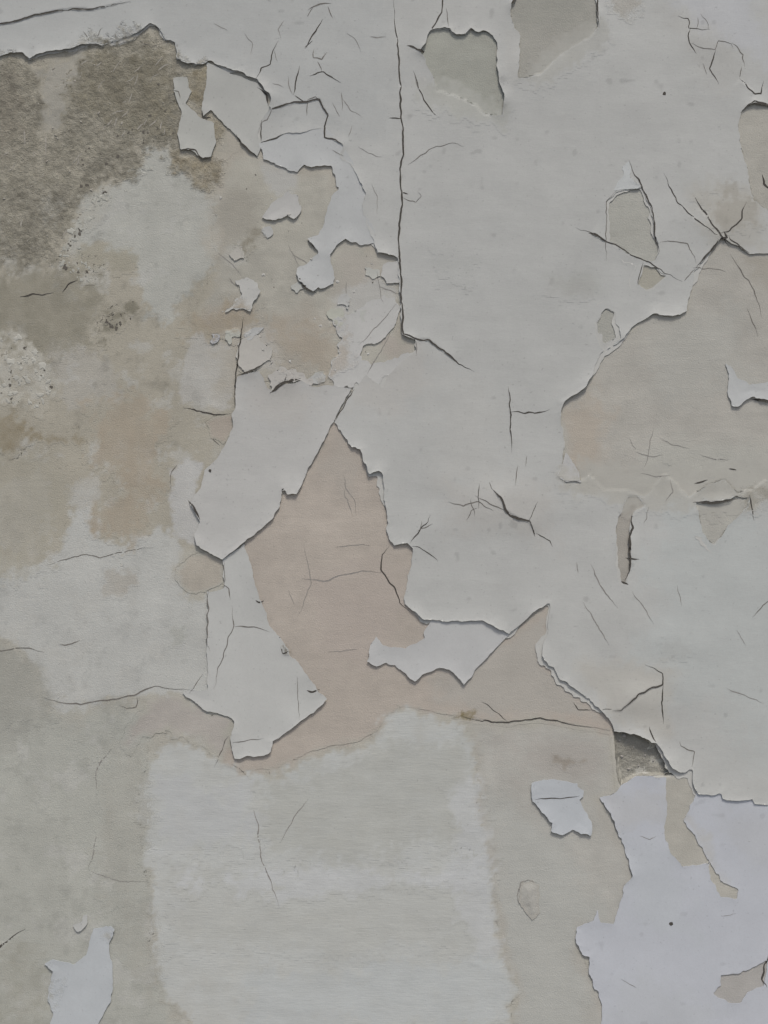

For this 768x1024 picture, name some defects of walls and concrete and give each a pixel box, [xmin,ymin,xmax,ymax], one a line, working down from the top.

water stain [28,41,93,137]
crack [217,0,471,417]
peeling [412,0,616,135]
crack [584,166,761,332]
peeling [738,103,768,210]
water stain [0,178,179,590]
peeling [0,20,611,772]
crack [450,389,552,545]
peeling [551,238,768,582]
crack [577,433,754,641]
peeling [473,723,633,1024]
peeling [613,729,738,899]